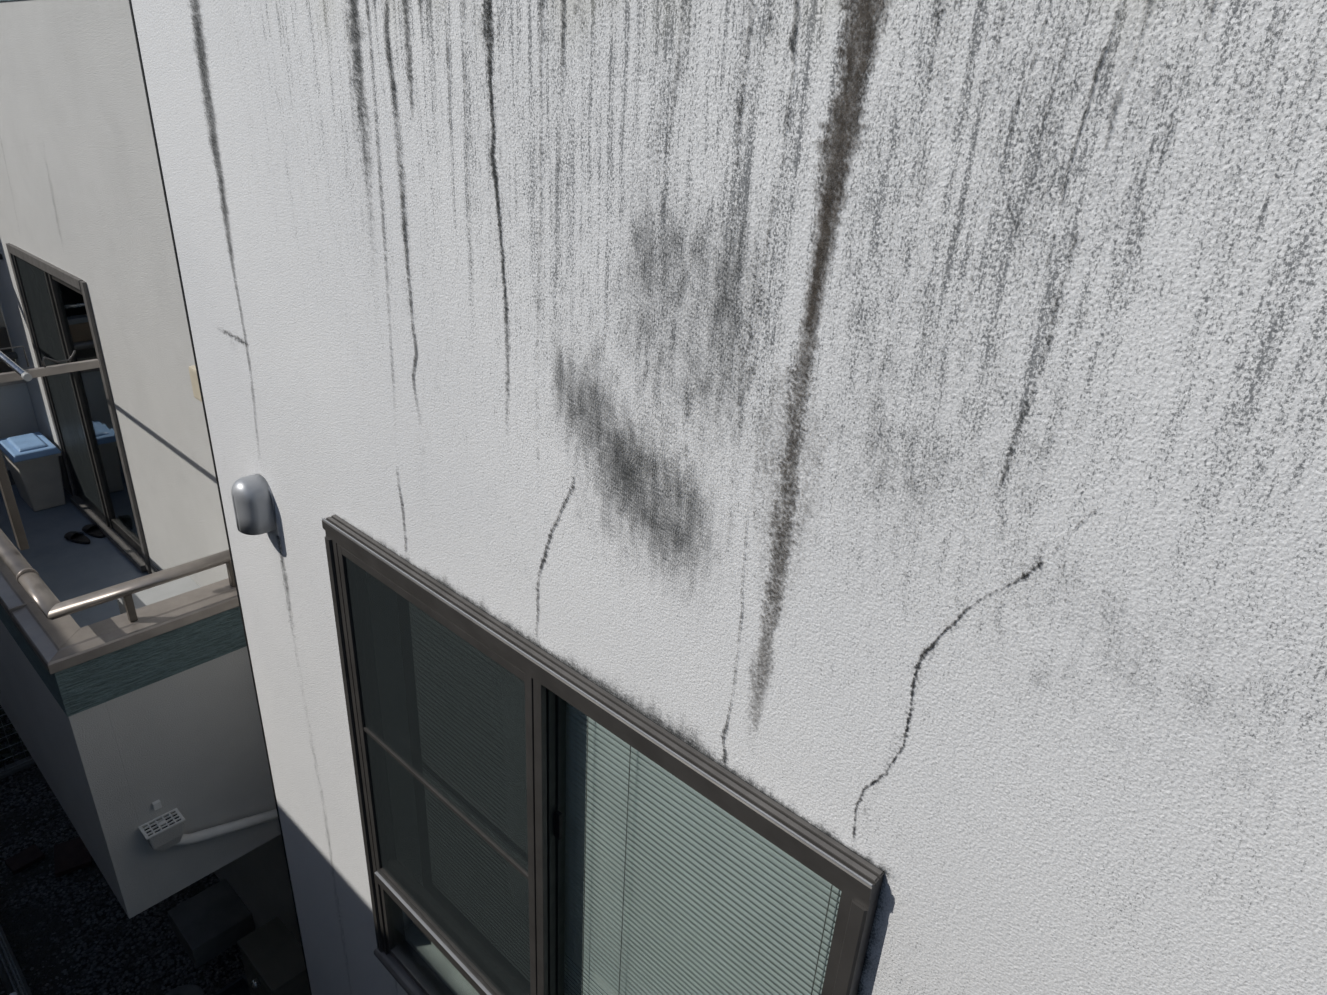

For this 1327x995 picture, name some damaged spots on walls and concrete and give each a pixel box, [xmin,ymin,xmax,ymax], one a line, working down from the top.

damp [190,0,254,397]
damp [345,0,422,394]
damp [482,0,509,409]
crack [536,478,574,635]
damp [554,355,710,574]
damp [627,210,748,420]
crack [720,523,747,763]
damp [753,0,887,710]
crack [853,556,1041,837]
damp [1060,12,1118,203]